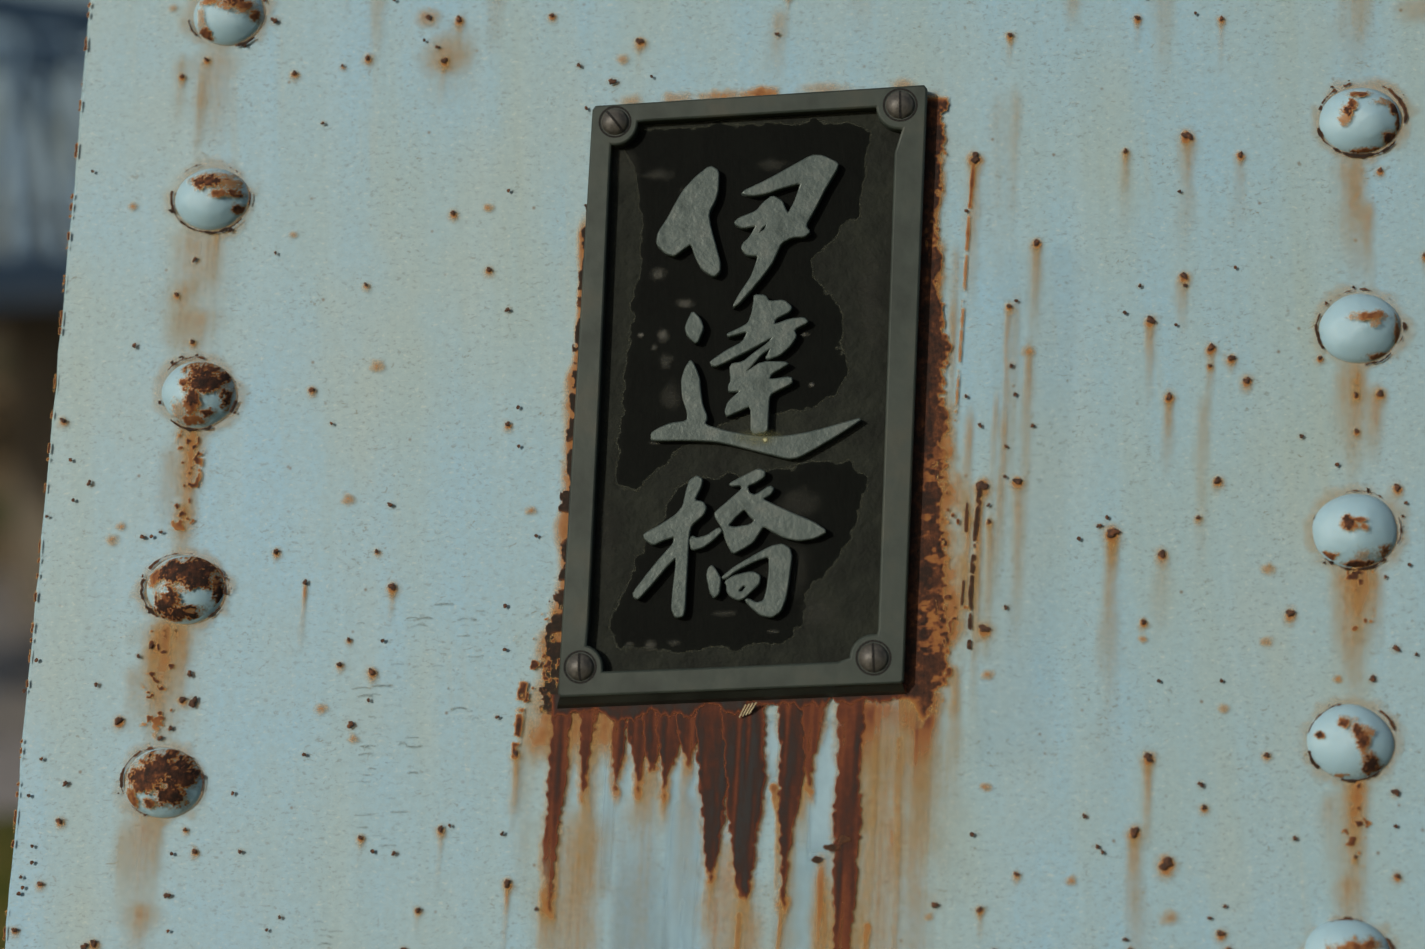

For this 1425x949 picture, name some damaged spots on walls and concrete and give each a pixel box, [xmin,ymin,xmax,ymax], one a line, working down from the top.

rust [188,0,278,64]
rust [169,161,251,234]
rust [1317,80,1408,198]
rust [140,339,240,539]
rust [534,96,1023,949]
rust [1322,483,1408,636]
rust [1306,704,1400,861]
rust [1316,916,1395,949]